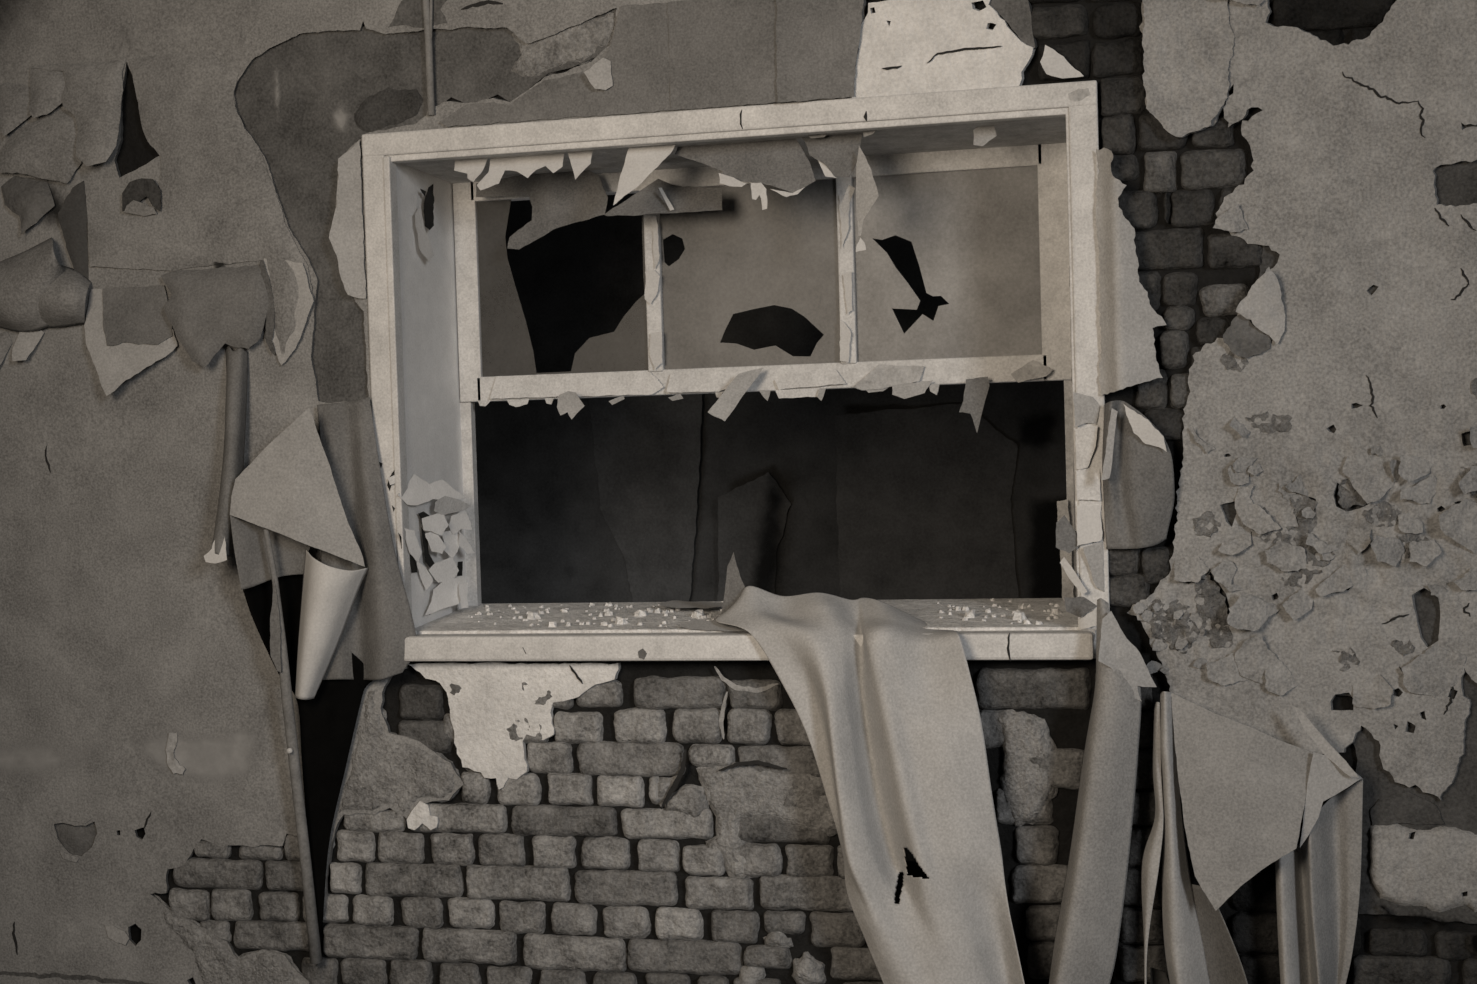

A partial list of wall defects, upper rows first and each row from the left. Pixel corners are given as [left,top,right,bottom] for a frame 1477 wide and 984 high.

peeling [613,130,879,252]
peeling [478,271,940,421]
peeling [379,462,474,615]
peeling [851,0,1477,984]
spalling [154,649,883,984]